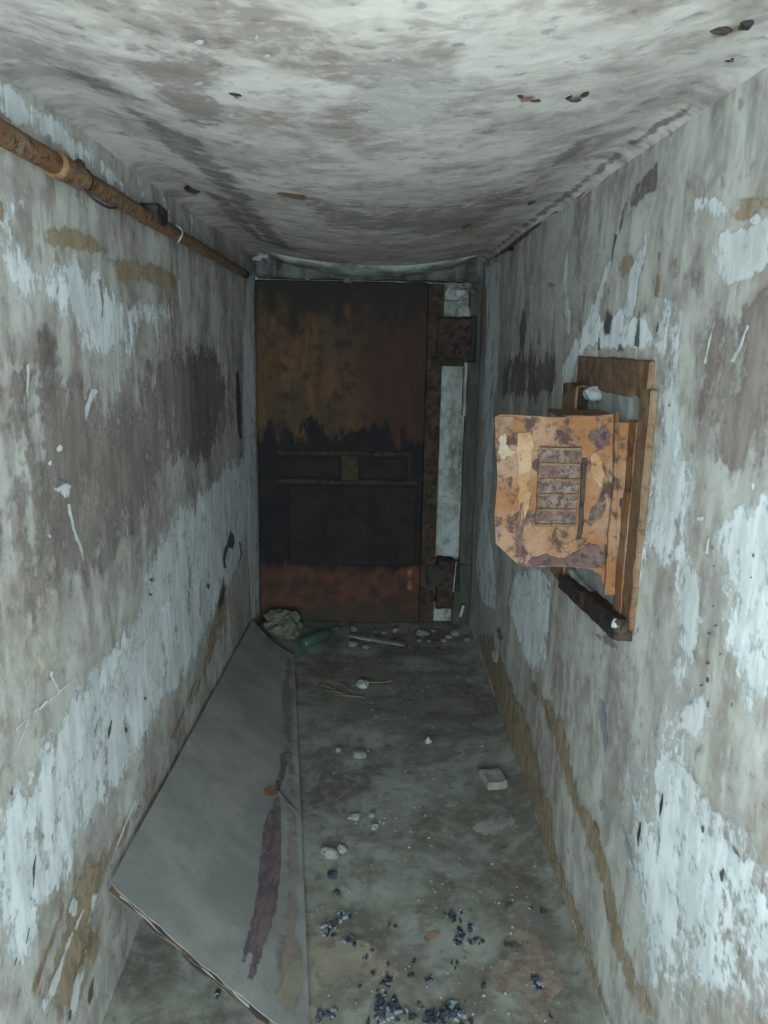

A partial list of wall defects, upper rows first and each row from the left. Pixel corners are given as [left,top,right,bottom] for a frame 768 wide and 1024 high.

leakage [0,81,145,199]
rust [47,226,106,258]
leakage [137,35,223,125]
leakage [129,109,294,251]
leakage [493,154,620,250]
leakage [629,110,687,144]
peeling [694,196,727,217]
peeling [712,214,768,286]
leakage [0,200,242,624]
peeling [54,484,71,498]
rust [480,628,609,1016]
rust [532,682,652,1024]